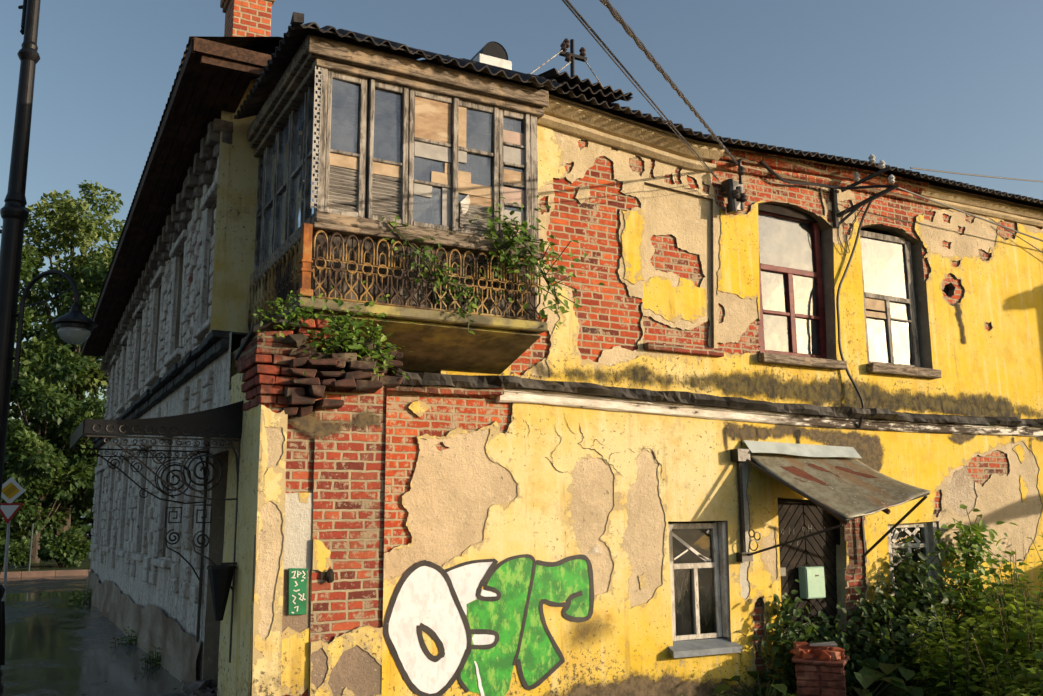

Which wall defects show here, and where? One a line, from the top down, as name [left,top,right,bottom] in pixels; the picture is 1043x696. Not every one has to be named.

flaking render [510,129,1043,378]
damp [955,302,966,344]
flaking render [256,501,284,639]
flaking render [261,366,517,696]
crack [525,414,662,478]
flaking render [570,450,666,608]
damp [724,422,883,472]
corrosion [780,463,881,485]
flaking render [933,441,1042,563]
damp [543,672,764,696]